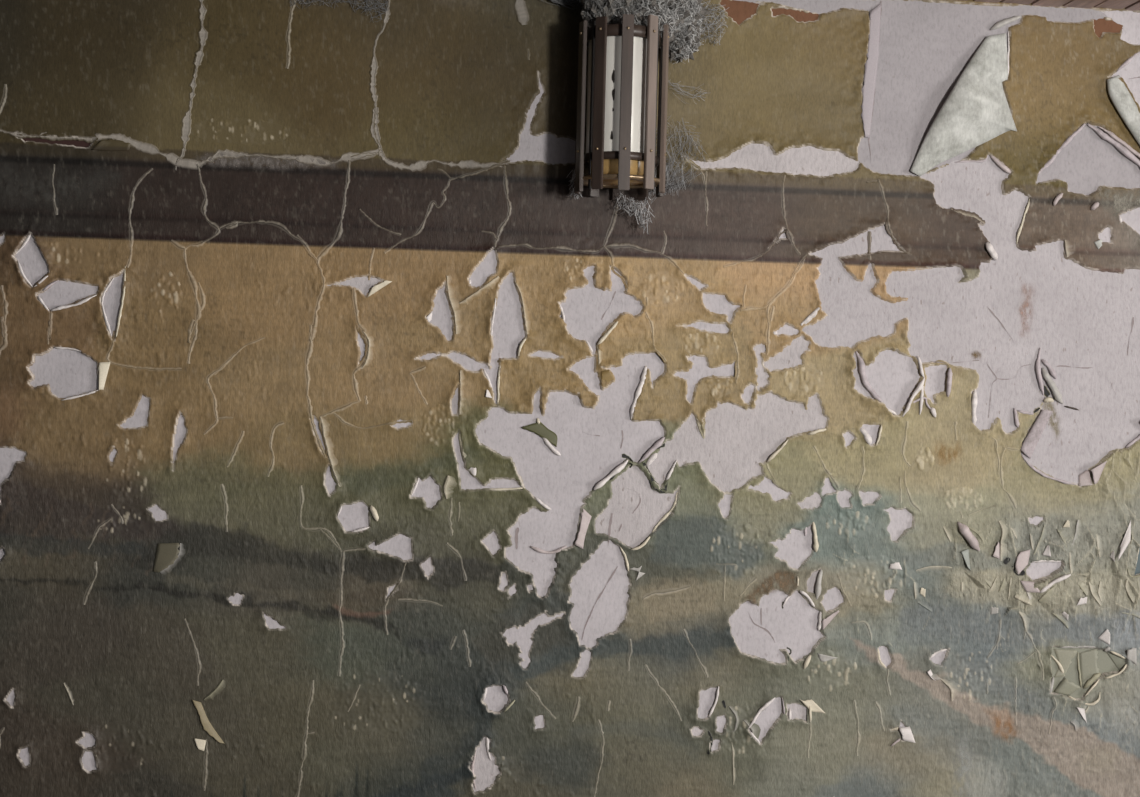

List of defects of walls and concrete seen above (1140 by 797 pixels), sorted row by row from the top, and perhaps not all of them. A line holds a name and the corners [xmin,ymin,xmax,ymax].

peeling [14,234,126,337]
crack [0,0,685,532]
peeling [29,347,110,401]
peeling [411,0,1140,677]
crack [82,504,124,605]
crack [582,430,668,639]
crack [183,618,202,686]
crack [294,485,366,797]
peeling [470,737,500,792]
peeling [482,685,515,712]
crack [525,681,611,797]
peeling [692,686,825,785]